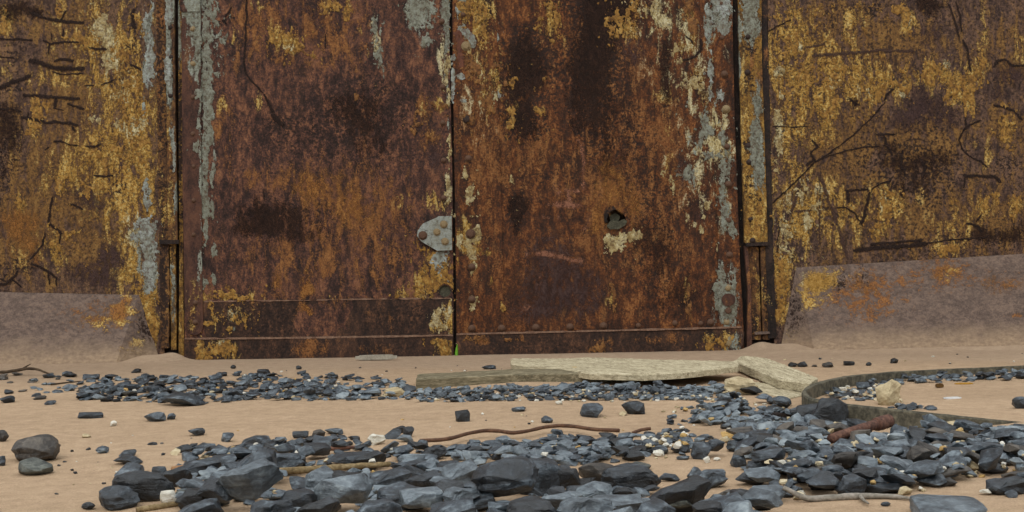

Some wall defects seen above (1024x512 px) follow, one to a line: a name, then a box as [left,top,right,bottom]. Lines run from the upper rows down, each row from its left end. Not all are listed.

crack [0,196,84,288]
crack [0,8,141,150]
rust [63,241,124,287]
peeling [41,0,234,343]
rust [234,170,374,242]
peeling [383,0,504,356]
rust [507,195,529,236]
rust [503,29,552,144]
rust [565,0,703,308]
peeling [597,0,992,325]
crack [958,104,1023,167]
crack [993,59,1024,67]